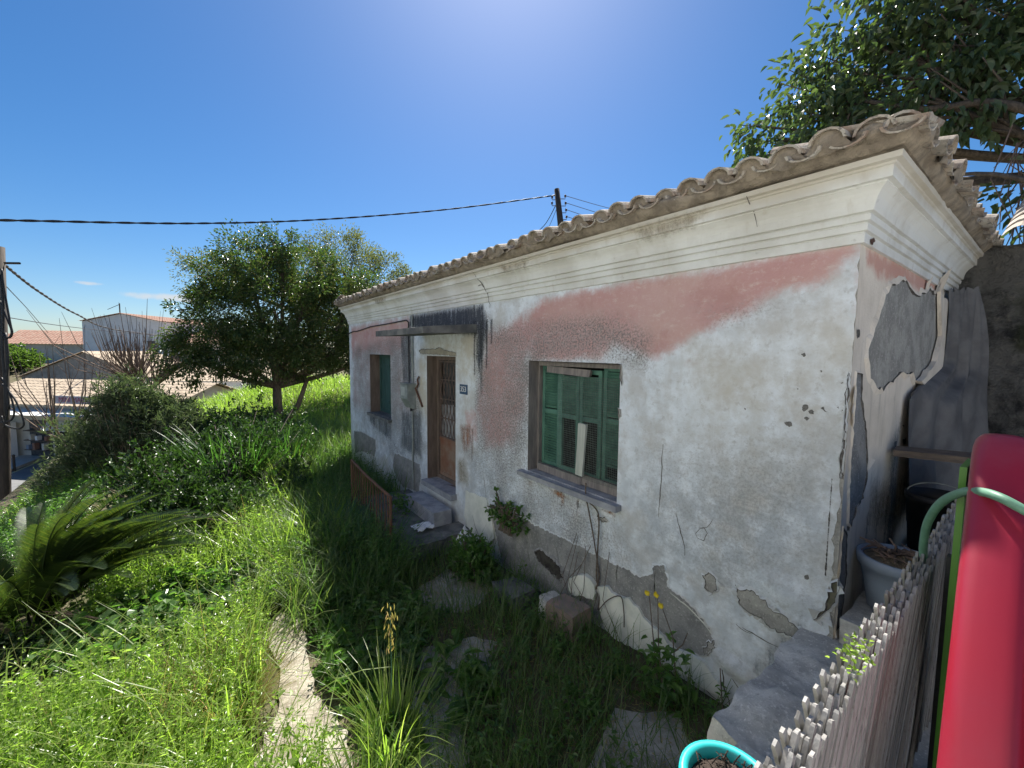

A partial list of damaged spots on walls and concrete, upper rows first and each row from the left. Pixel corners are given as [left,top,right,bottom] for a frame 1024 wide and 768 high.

damp [401,305,492,382]
crack [658,449,713,556]
flaking render [701,268,952,639]
crack [824,484,832,576]
flaking render [464,490,725,699]